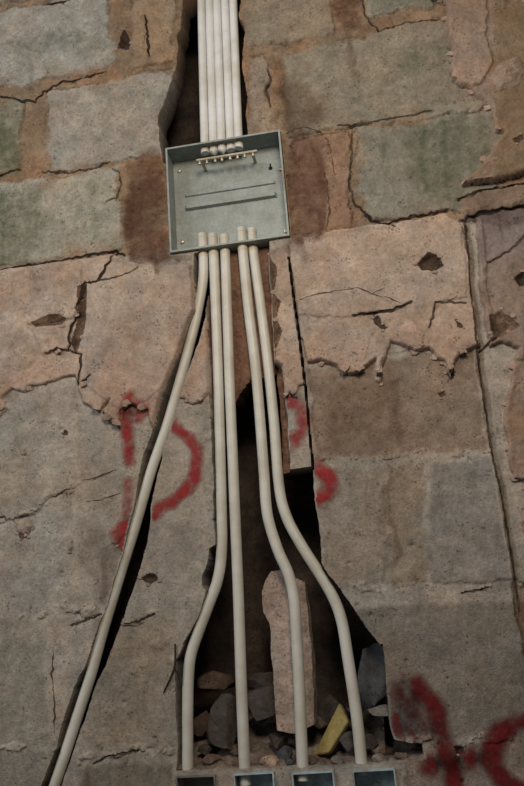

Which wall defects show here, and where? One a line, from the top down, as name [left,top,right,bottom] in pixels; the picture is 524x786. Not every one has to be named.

crack [0,249,136,386]
peeling [0,254,196,429]
peeling [179,321,212,405]
peeling [267,0,524,490]
crack [285,110,524,612]
crack [0,470,120,533]